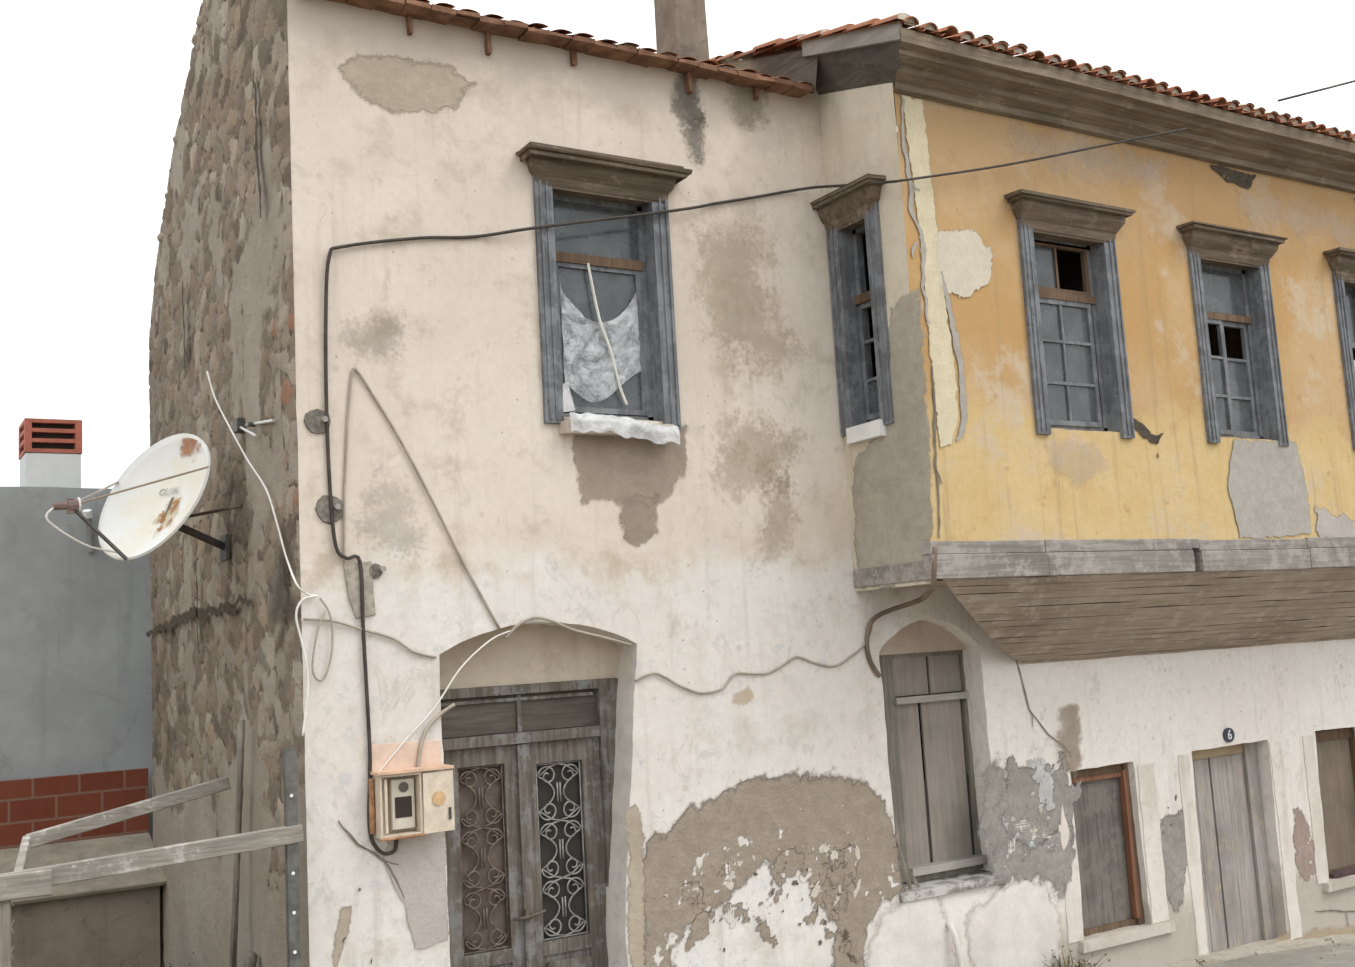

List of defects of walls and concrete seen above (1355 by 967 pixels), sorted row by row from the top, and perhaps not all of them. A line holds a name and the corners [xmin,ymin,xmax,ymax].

peeling [339,55,476,113]
peeling [852,95,993,569]
peeling [1228,439,1355,539]
peeling [625,768,906,967]
peeling [978,751,1082,902]
spalling [1160,795,1188,911]
peeling [1293,808,1316,881]